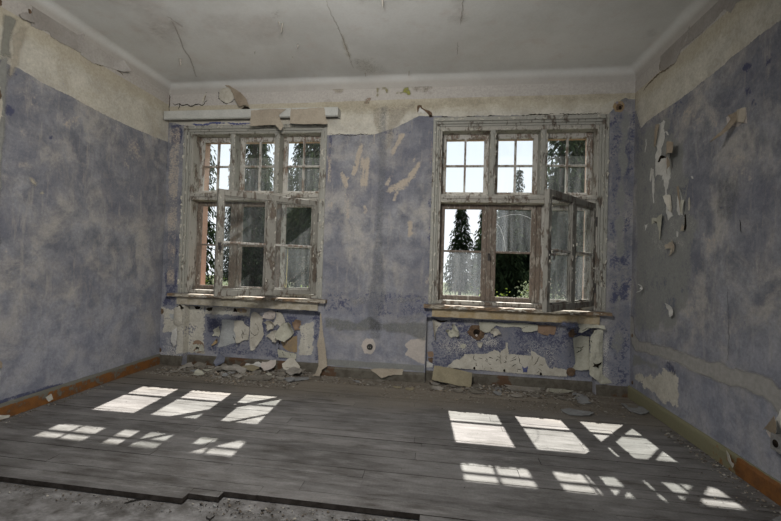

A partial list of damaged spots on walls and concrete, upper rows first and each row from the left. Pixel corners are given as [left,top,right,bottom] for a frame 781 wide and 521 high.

crack [169,94,250,126]
peeling [179,125,326,284]
peeling [417,98,617,293]
peeling [645,120,690,256]
flaking render [171,279,214,347]
peeling [211,296,247,347]
peeling [262,310,301,353]
flaking render [435,302,611,384]